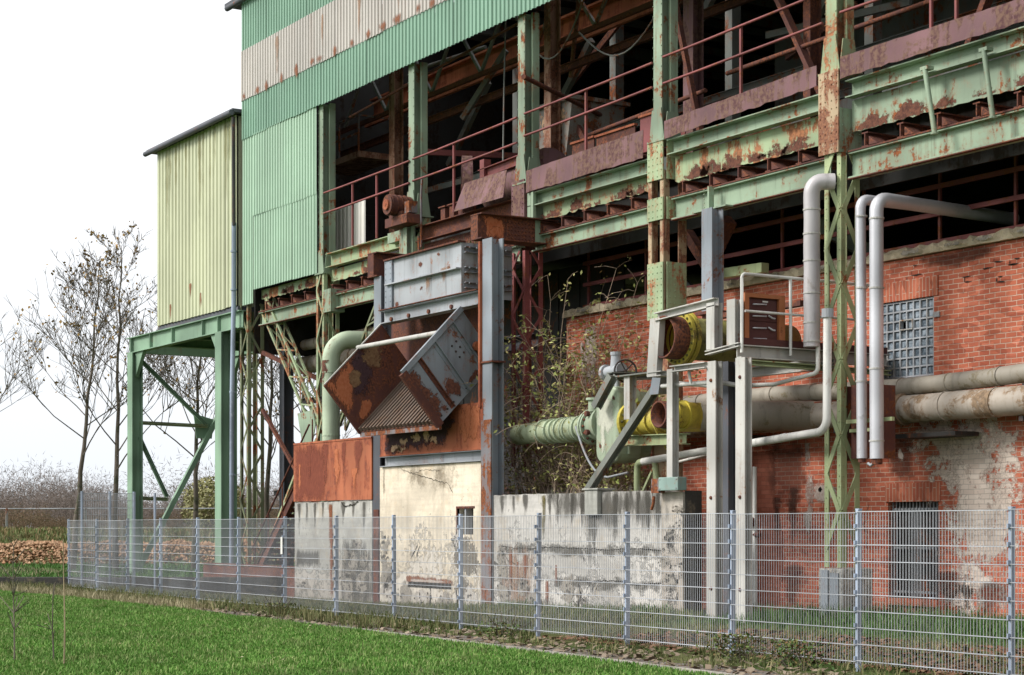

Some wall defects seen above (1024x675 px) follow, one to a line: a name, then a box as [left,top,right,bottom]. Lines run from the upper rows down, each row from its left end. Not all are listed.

rust [857,95,956,131]
rust [684,136,815,180]
rust [322,360,372,419]
rust [410,370,480,443]
rust [295,441,362,593]
spalling [339,531,479,608]
damp [499,487,660,562]
damp [554,577,659,592]
spalling [658,505,684,604]